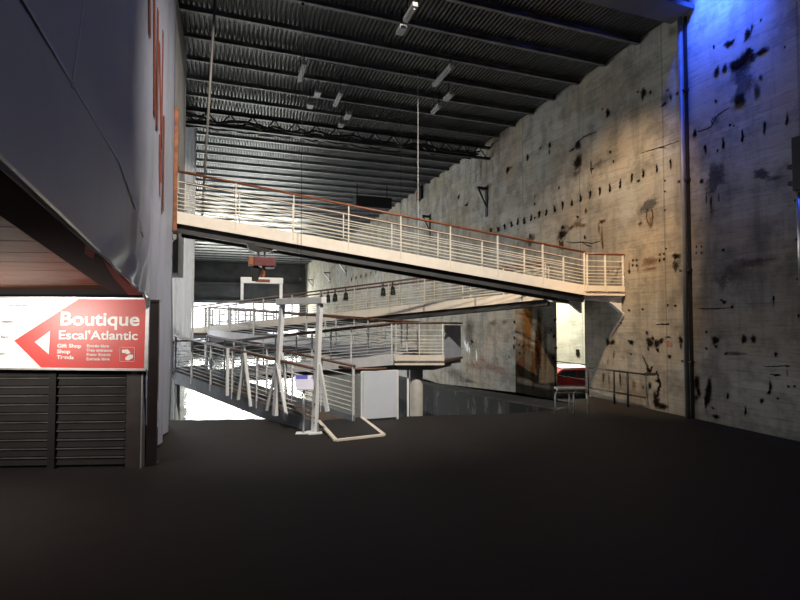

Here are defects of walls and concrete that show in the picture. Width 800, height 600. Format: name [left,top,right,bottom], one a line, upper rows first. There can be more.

crack [640,107,729,154]
rust [523,308,542,387]